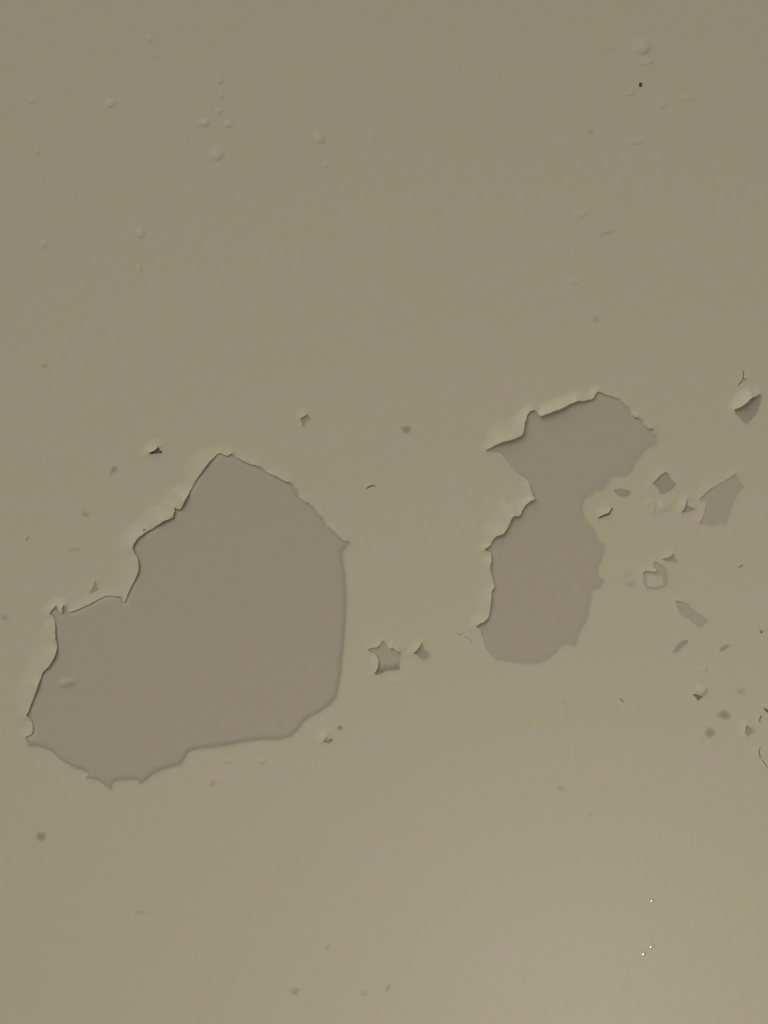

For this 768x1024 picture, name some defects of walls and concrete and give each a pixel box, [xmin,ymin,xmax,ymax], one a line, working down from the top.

peeling [14,443,433,795]
peeling [466,383,748,668]
peeling [726,384,768,427]